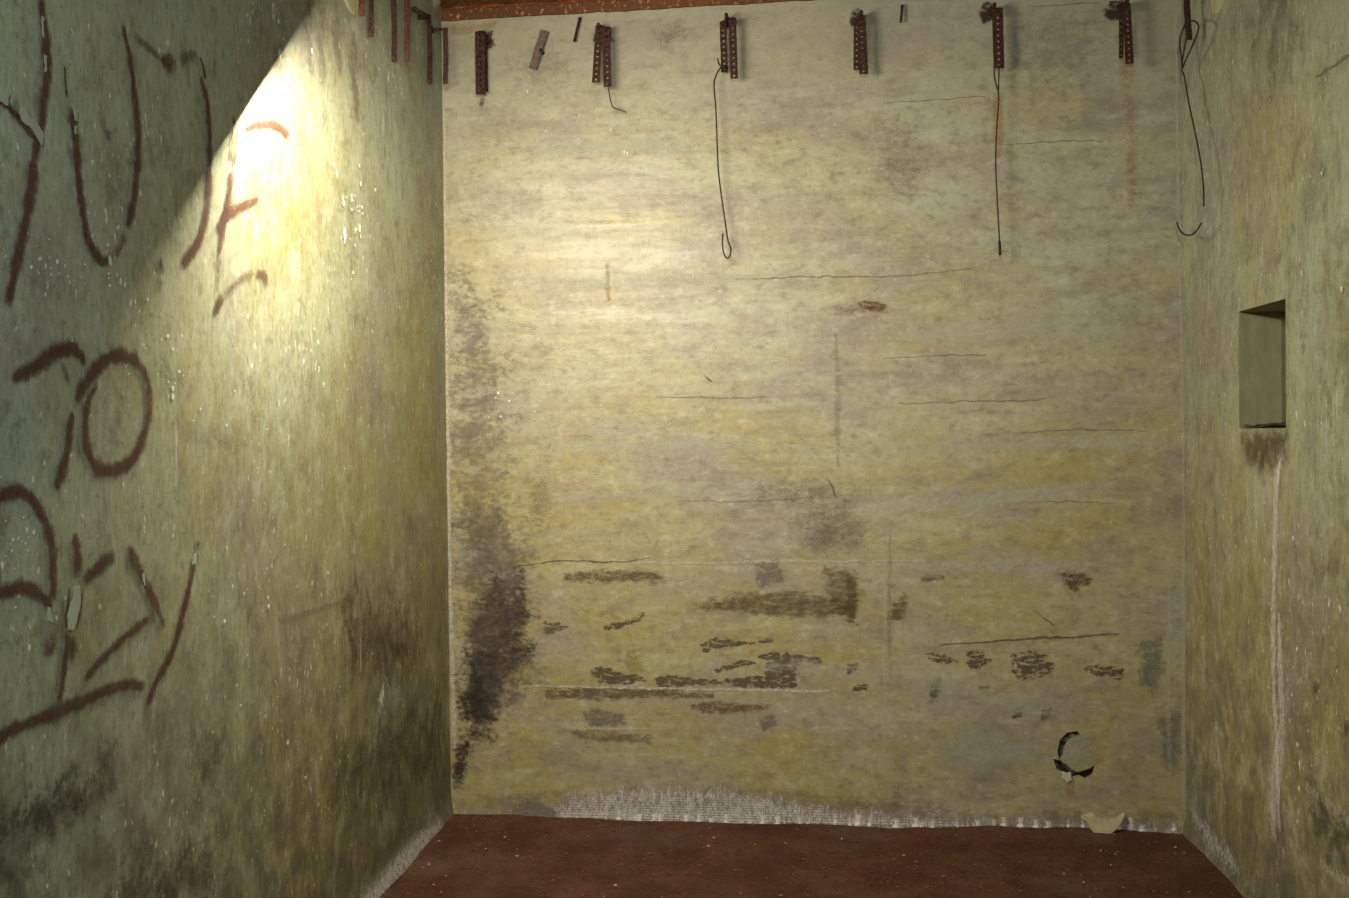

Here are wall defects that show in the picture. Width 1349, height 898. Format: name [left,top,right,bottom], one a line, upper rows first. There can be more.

water stain [1244,433,1283,482]
water stain [565,571,660,582]
water stain [704,562,855,623]
water stain [1060,571,1092,592]
water stain [452,567,534,788]
water stain [545,686,777,731]